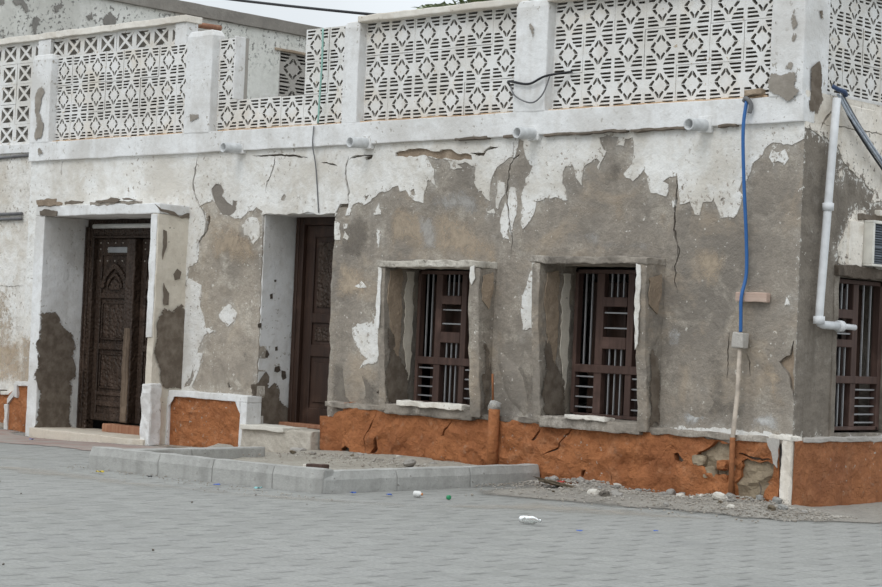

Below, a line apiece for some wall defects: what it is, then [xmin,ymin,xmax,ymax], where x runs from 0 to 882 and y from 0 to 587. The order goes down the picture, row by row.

peeling [0,0,40,35]
peeling [86,12,116,25]
peeling [34,87,44,155]
peeling [768,62,799,101]
peeling [809,61,823,114]
peeling [154,184,288,425]
peeling [327,126,882,500]
peeling [34,312,76,428]